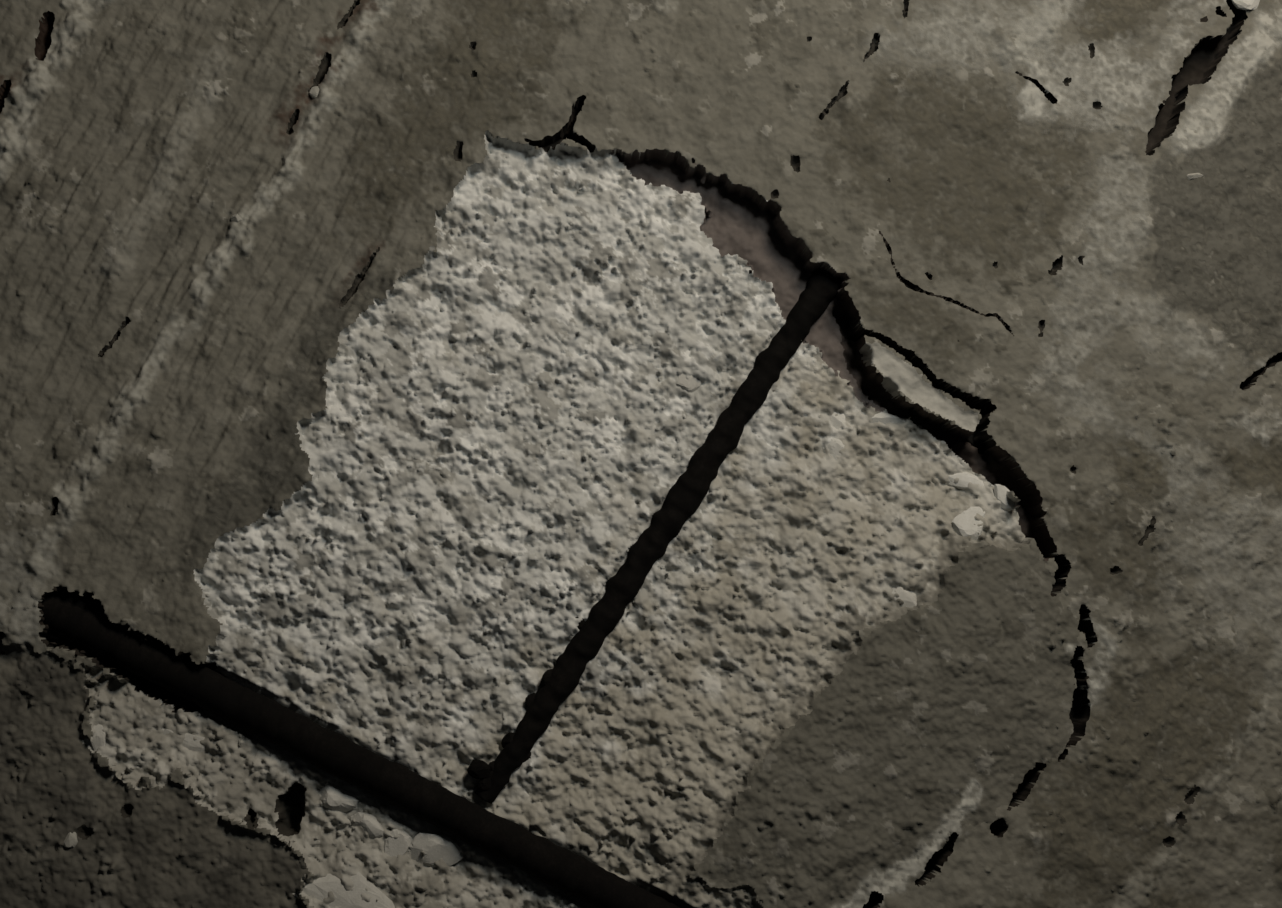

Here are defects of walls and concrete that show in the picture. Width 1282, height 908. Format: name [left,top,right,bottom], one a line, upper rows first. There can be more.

crack [286,0,360,135]
leakage [346,0,560,232]
crack [524,95,596,153]
crack [1145,0,1248,156]
crack [98,316,130,357]
crack [879,231,1014,336]
spalling [1048,255,1085,276]
leakage [180,269,396,574]
spalling [0,130,1031,908]
crack [832,290,1098,838]
crack [863,891,884,908]
crack [915,832,959,887]